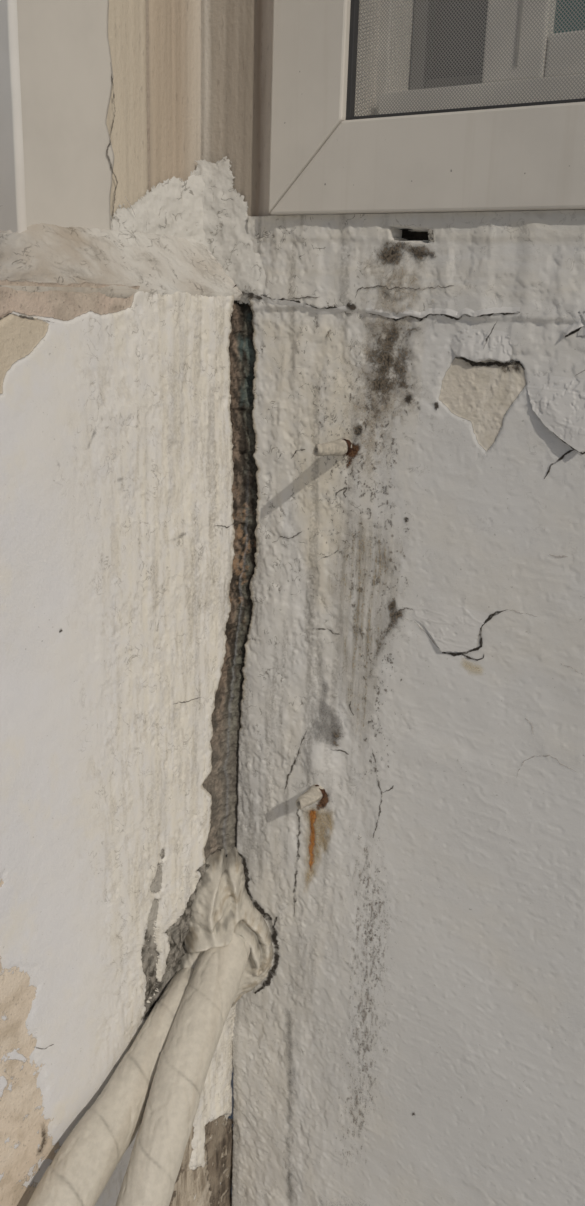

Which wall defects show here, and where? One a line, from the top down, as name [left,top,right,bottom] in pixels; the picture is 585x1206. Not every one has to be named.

leakage [377,242,436,265]
spalling [0,280,140,394]
leakage [365,324,419,417]
peeling [439,323,526,451]
crack [562,310,585,337]
crack [175,284,537,994]
leakage [376,598,403,654]
corrosion [293,793,332,913]
spalling [0,957,61,1206]
spalling [169,1115,233,1206]